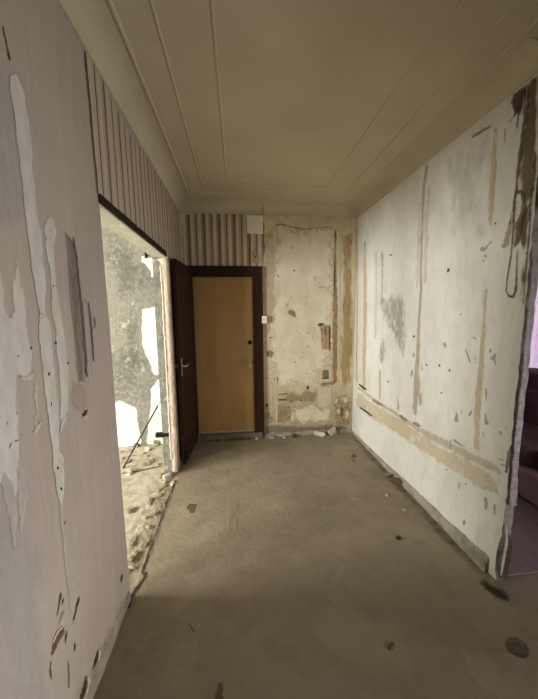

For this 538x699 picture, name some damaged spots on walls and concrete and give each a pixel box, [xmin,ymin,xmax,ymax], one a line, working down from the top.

water stain [502,77,537,304]
flaking render [115,256,178,472]
peeling [318,356,351,424]
flaking render [50,626,68,679]
flaking render [80,650,101,699]